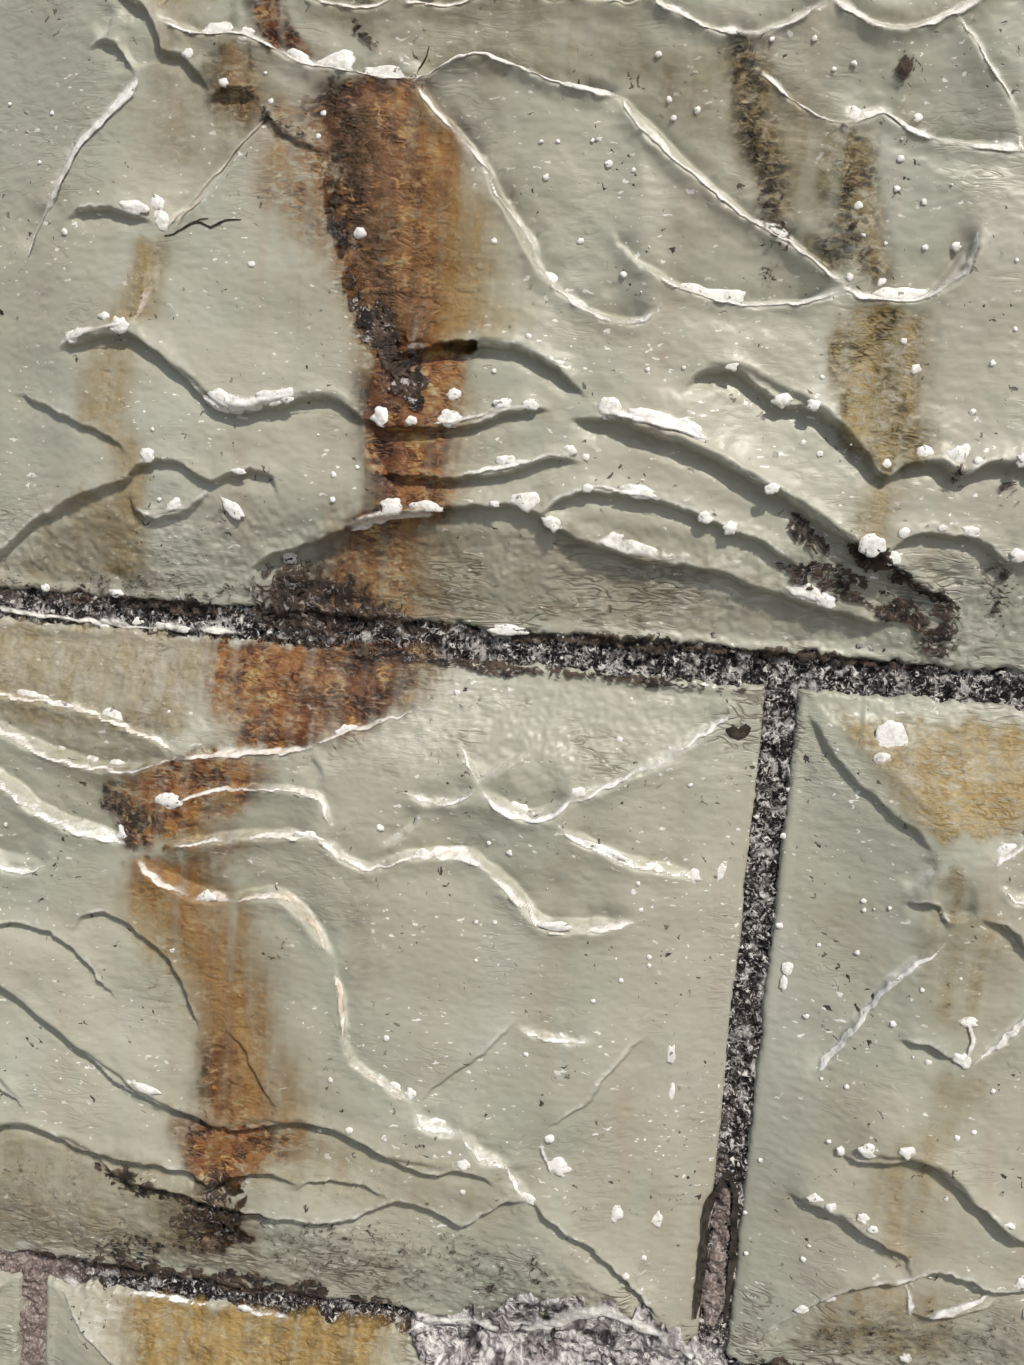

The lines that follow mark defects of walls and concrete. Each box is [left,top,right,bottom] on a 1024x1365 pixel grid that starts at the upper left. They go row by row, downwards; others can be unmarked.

corrosion [213,44,255,120]
corrosion [247,0,307,55]
crack [415,46,429,77]
crack [164,218,241,237]
corrosion [290,75,483,618]
leakage [764,483,780,495]
leakage [982,548,1024,637]
leakage [0,510,962,952]
corrosion [107,637,416,1185]
leakage [334,976,416,1100]
crack [693,1170,738,1322]
corrosion [129,1294,380,1365]